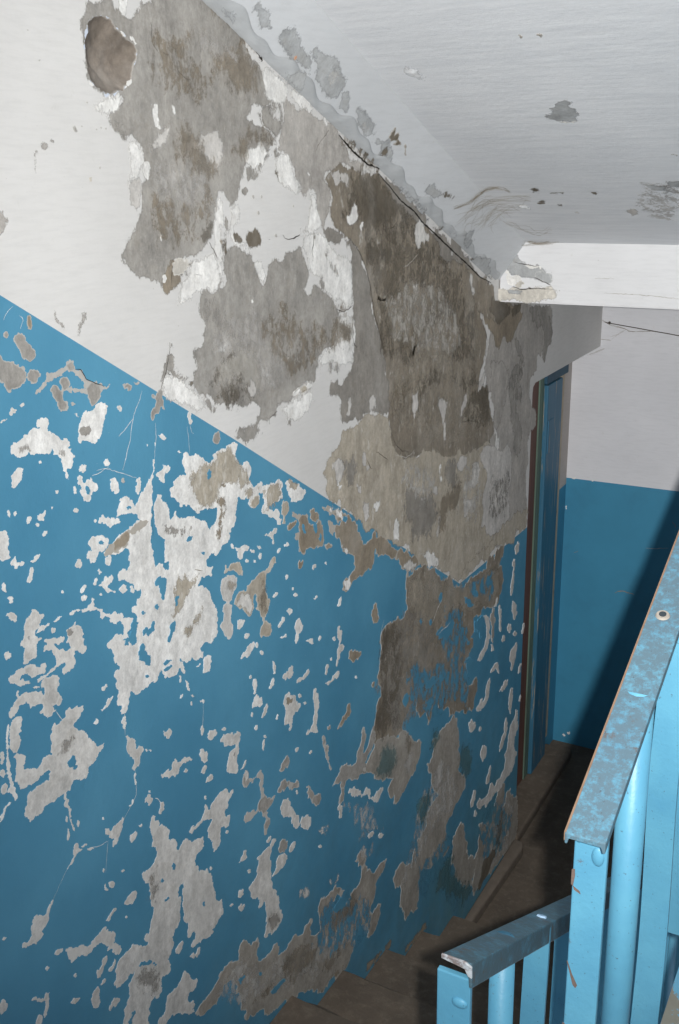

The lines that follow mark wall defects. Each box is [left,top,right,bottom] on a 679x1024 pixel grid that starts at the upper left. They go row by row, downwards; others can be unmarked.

peeling [546,100,579,123]
crack [339,135,491,283]
spalling [498,255,558,304]
flaking render [0,0,525,1024]
leakage [323,162,553,745]